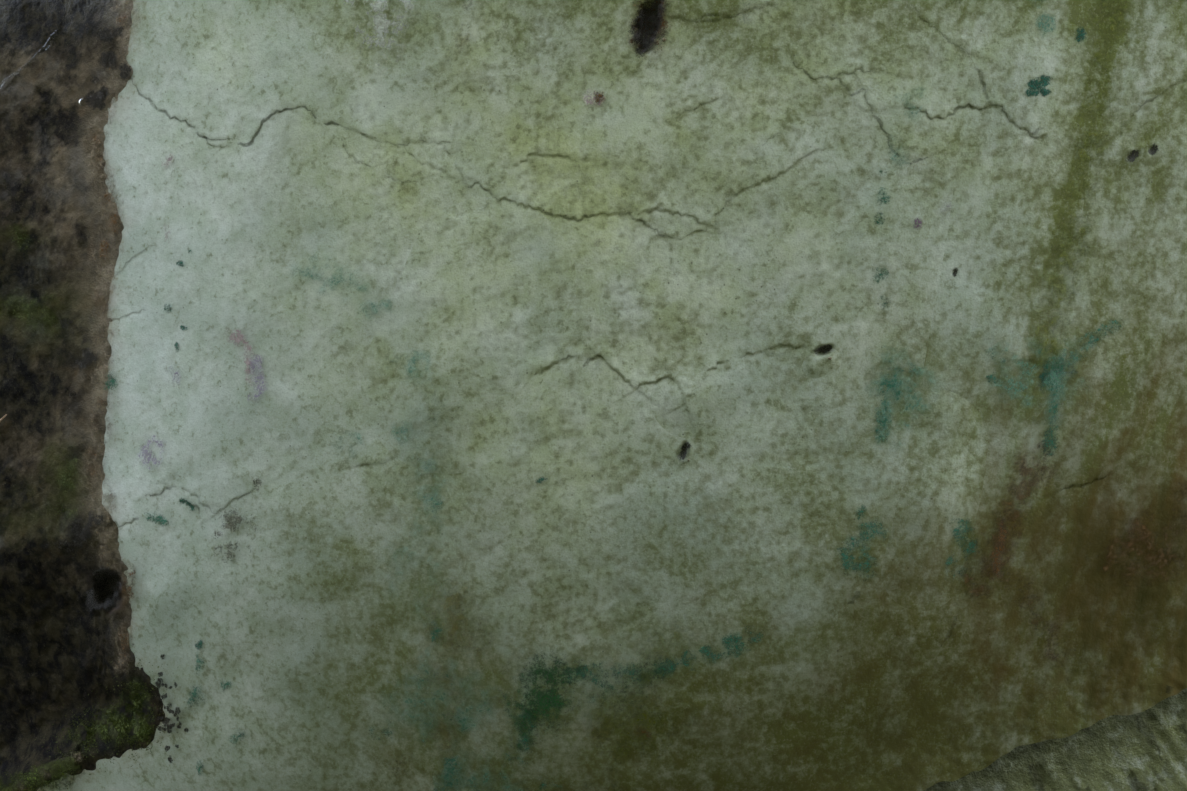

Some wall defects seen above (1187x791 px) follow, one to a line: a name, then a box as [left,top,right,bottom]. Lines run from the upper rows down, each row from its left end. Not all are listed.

spalling [628,0,668,54]